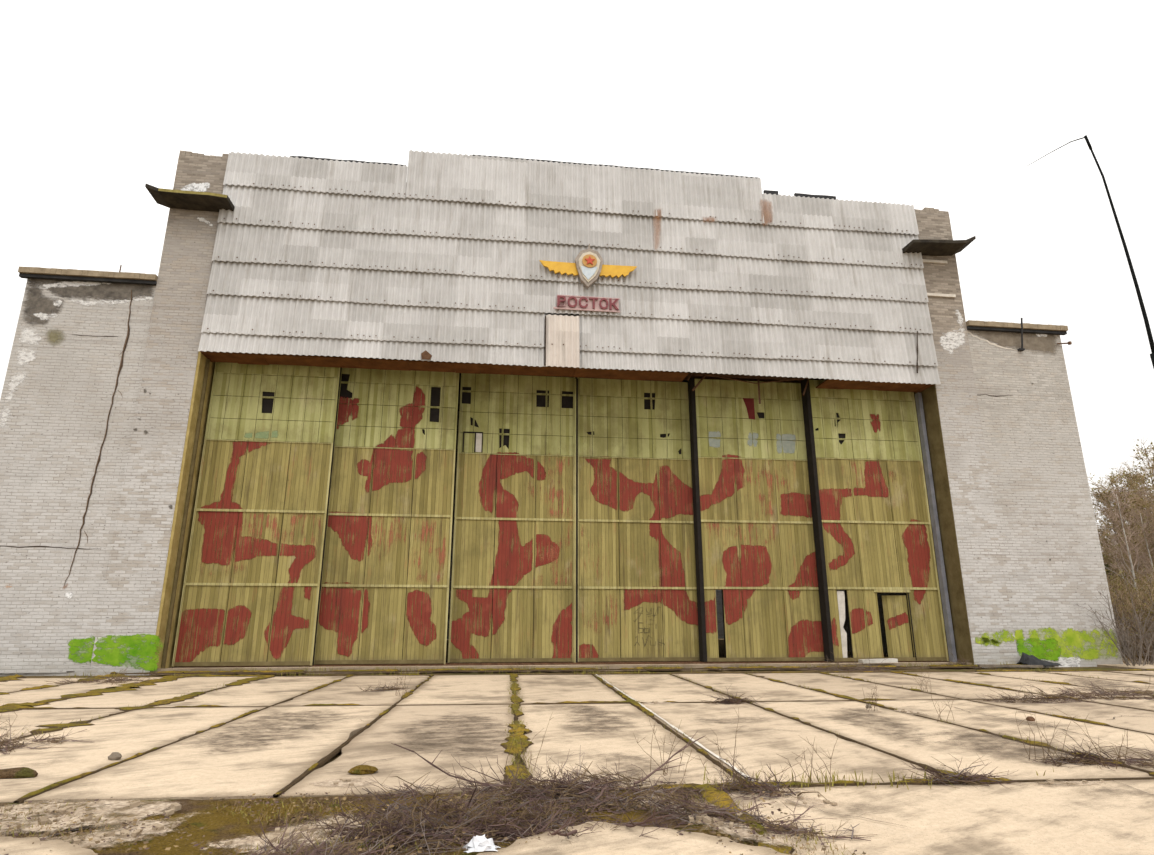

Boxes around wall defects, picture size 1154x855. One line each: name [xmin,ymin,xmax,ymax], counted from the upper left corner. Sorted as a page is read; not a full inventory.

damp [24,279,154,324]
peeling [940,310,966,354]
crack [5,290,154,586]